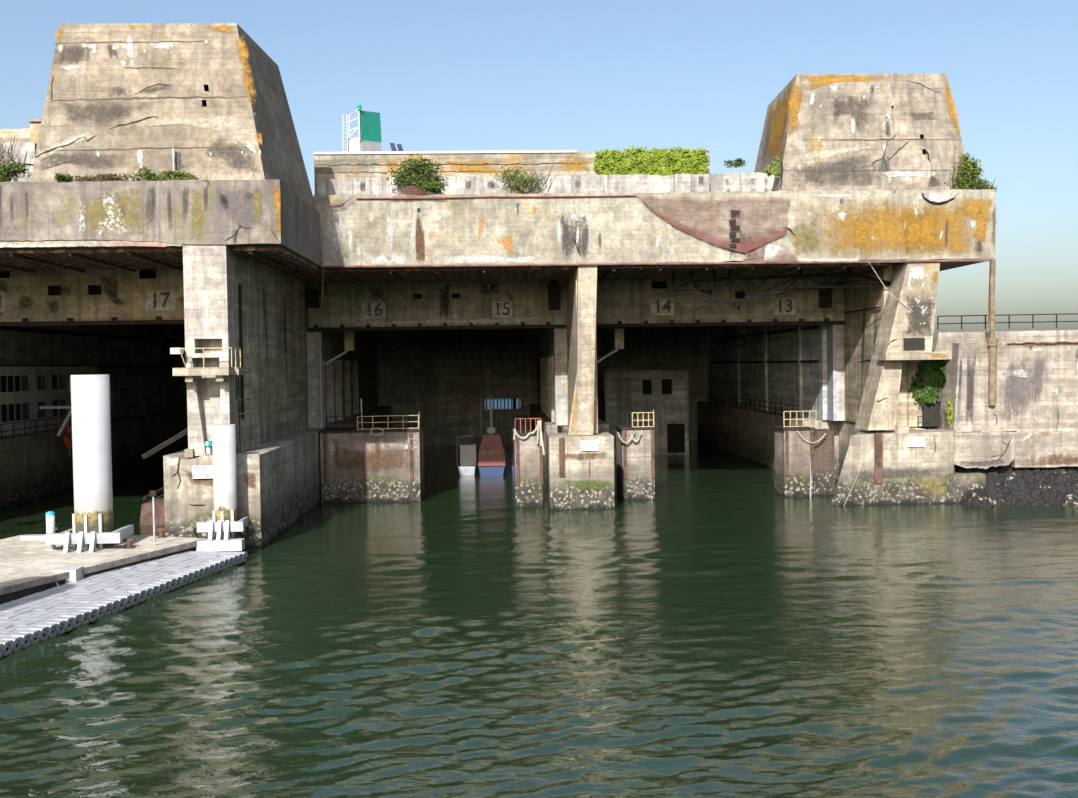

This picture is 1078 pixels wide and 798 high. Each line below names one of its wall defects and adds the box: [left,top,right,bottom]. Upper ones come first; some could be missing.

water stain [59,38,173,62]
water stain [237,40,255,97]
water stain [68,89,128,123]
crack [18,40,259,166]
water stain [42,154,113,168]
water stain [207,140,256,170]
water stain [147,189,188,225]
crack [3,238,180,246]
rust [416,208,425,260]
rust [729,210,740,254]
water stain [999,362,1043,413]
rust [334,441,401,470]